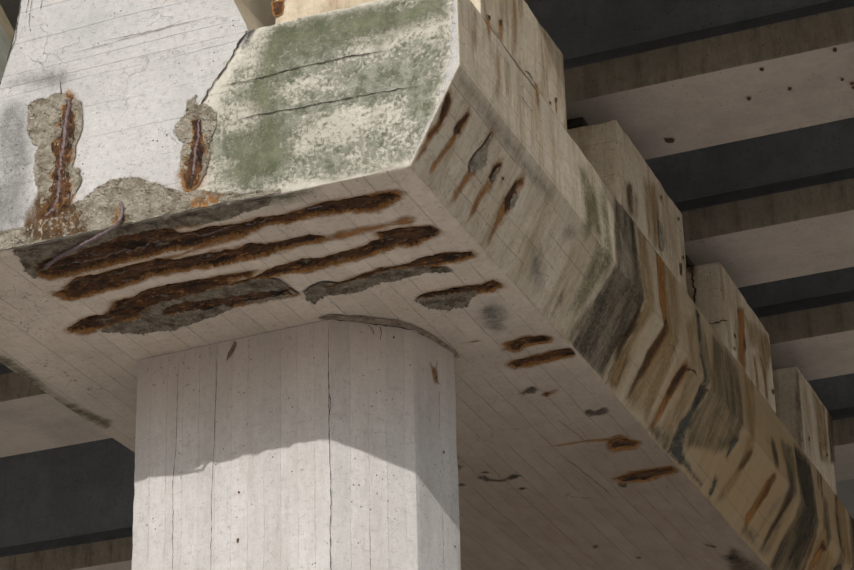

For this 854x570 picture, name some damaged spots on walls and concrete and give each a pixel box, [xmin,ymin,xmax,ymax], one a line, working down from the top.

spalling [0,29,476,335]
corrosion [416,92,451,160]
corrosion [430,112,470,173]
corrosion [454,131,502,215]
corrosion [489,178,524,242]
spalling [415,280,503,311]
leakage [573,183,678,414]
crack [687,265,697,303]
spalling [318,314,459,358]
leakage [652,311,743,479]
leakage [763,440,854,570]